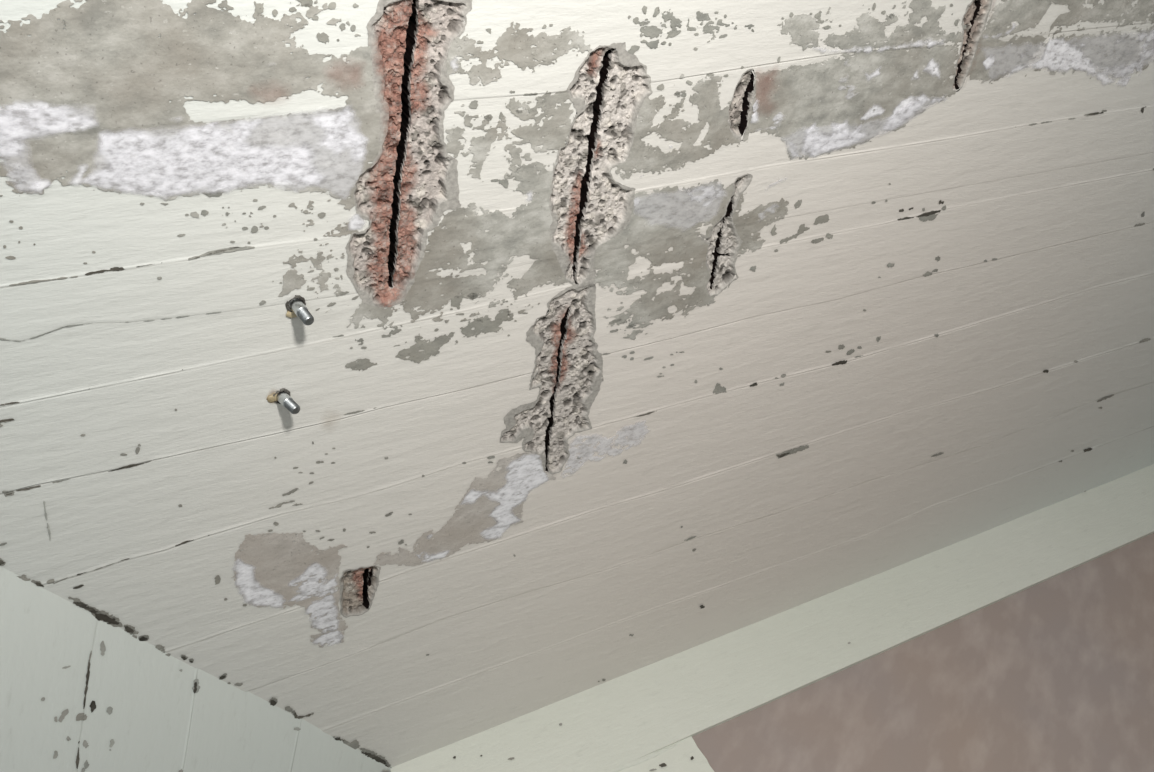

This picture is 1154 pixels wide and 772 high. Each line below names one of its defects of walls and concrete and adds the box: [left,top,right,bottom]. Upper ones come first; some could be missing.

peeling [296,0,336,20]
peeling [628,7,682,49]
peeling [687,11,737,42]
rust [369,2,434,307]
peeling [222,199,276,244]
rust [567,179,586,260]
peeling [774,214,829,252]
peeling [278,250,345,298]
peeling [456,299,516,337]
peeling [345,338,377,371]
peeling [395,328,458,363]
rust [551,314,571,377]